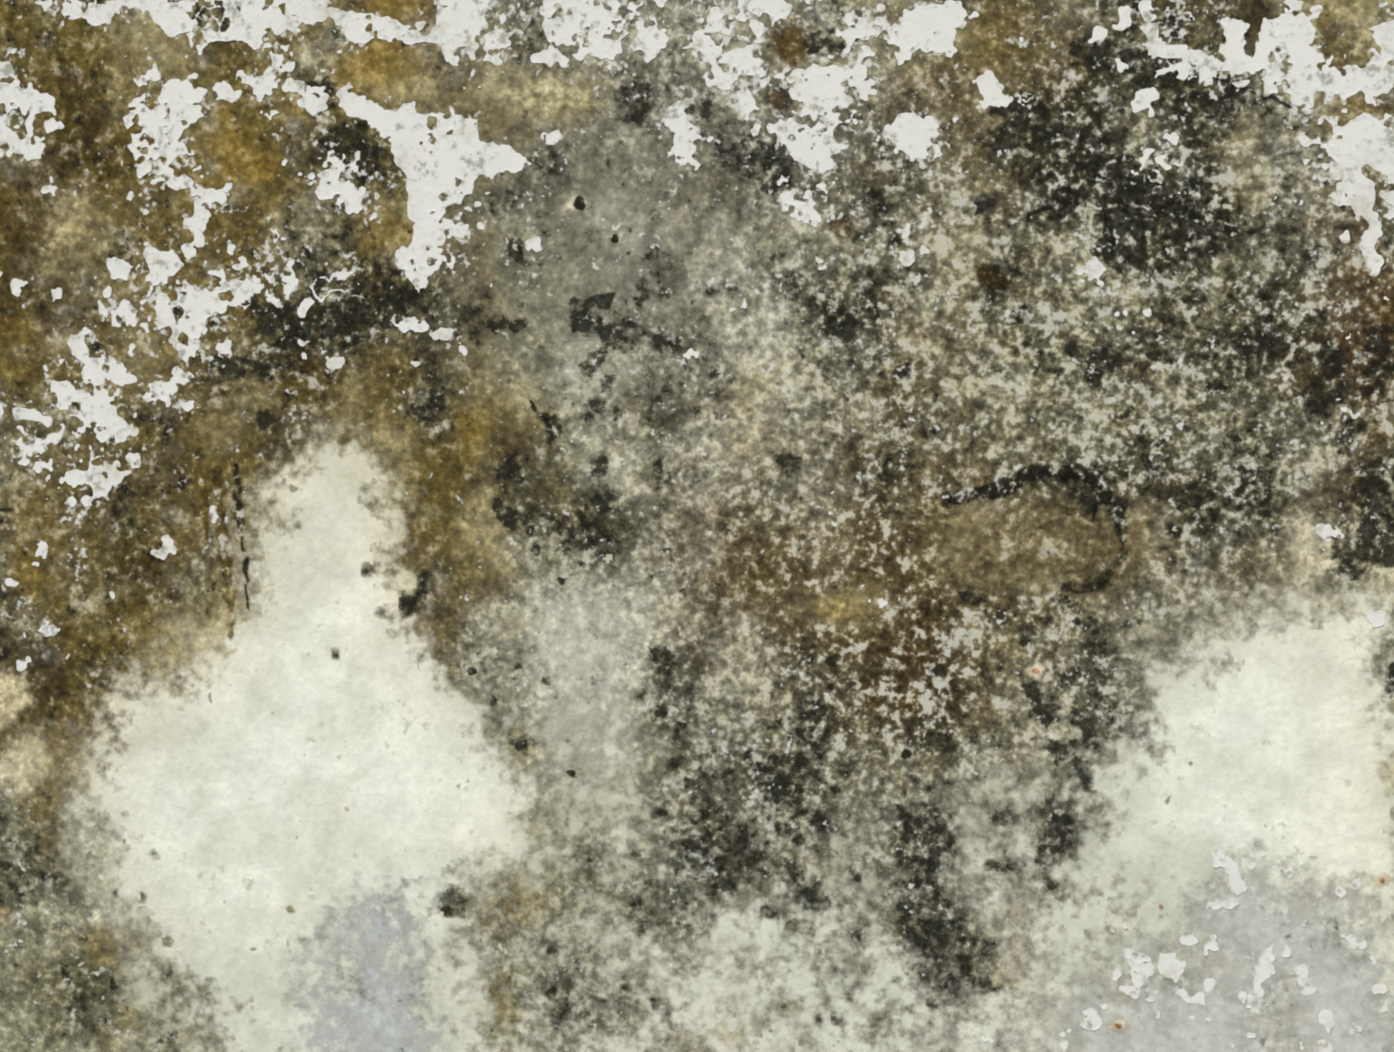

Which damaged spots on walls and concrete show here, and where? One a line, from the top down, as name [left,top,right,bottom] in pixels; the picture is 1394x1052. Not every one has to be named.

leakage [765,89,791,111]
peeling [973,70,1034,109]
peeling [1088,0,1394,276]
peeling [0,0,979,518]
peeling [1070,245,1107,293]
leakage [172,305,190,324]
peeling [151,534,177,560]
mould [1372,632,1394,713]
mould [437,884,468,918]
leakage [902,951,955,989]
peeling [1112,932,1219,1022]
mould [617,953,716,1052]